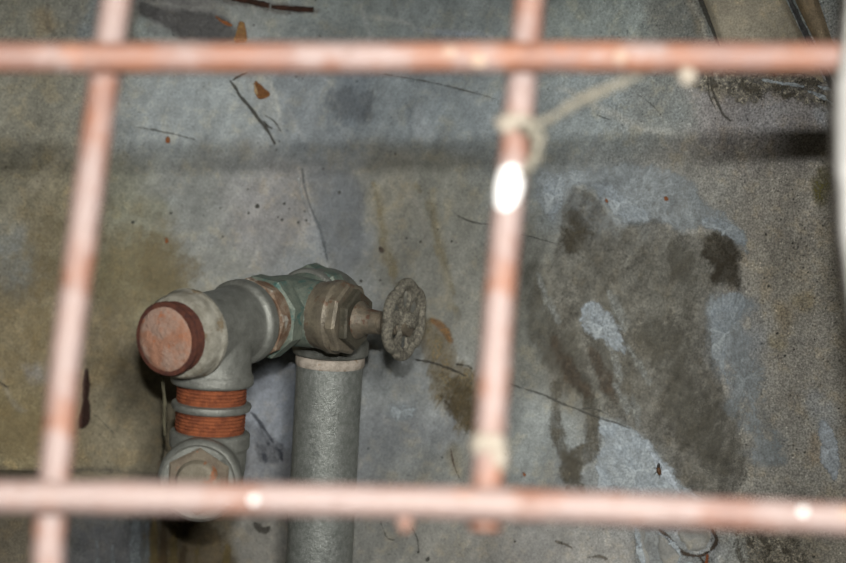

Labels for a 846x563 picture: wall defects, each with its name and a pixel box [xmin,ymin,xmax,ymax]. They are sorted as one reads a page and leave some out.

corrosion [224,0,318,14]
crack [229,73,281,144]
corrosion [254,81,270,99]
leakage [527,164,786,496]
crack [510,383,628,428]